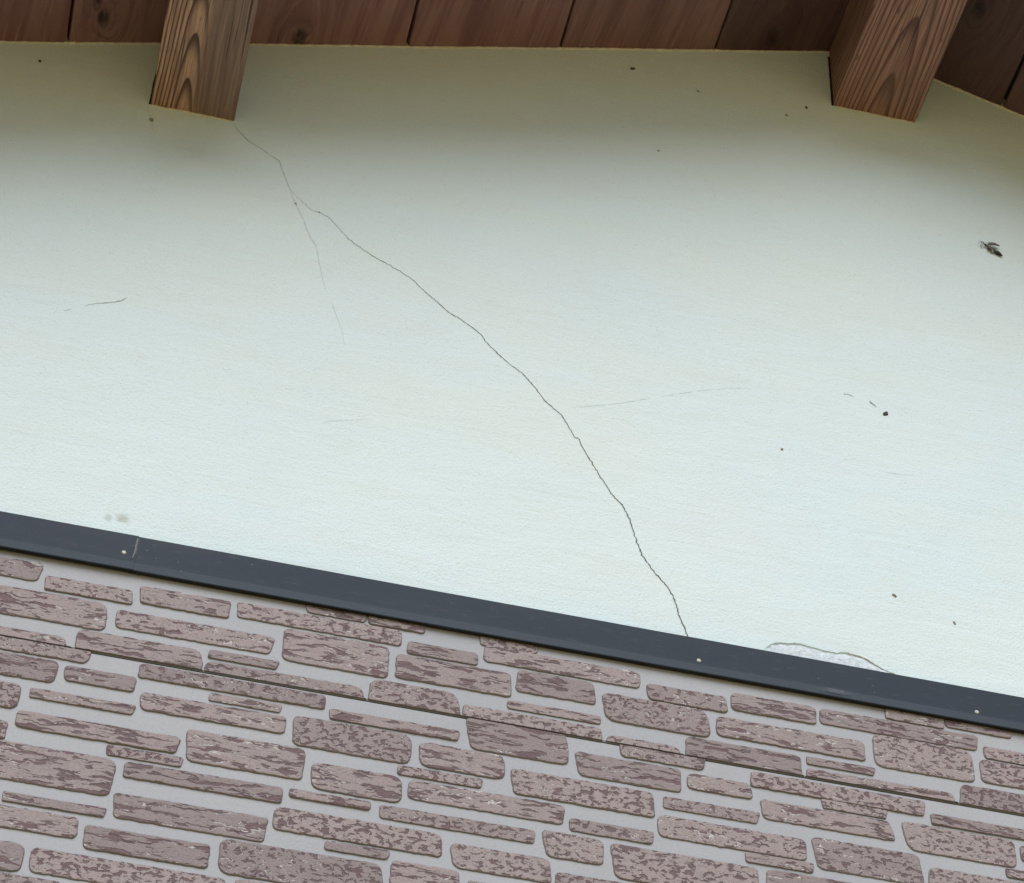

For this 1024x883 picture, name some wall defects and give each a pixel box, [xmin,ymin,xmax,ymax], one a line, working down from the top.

crack [235,126,723,637]
spalling [765,640,895,674]